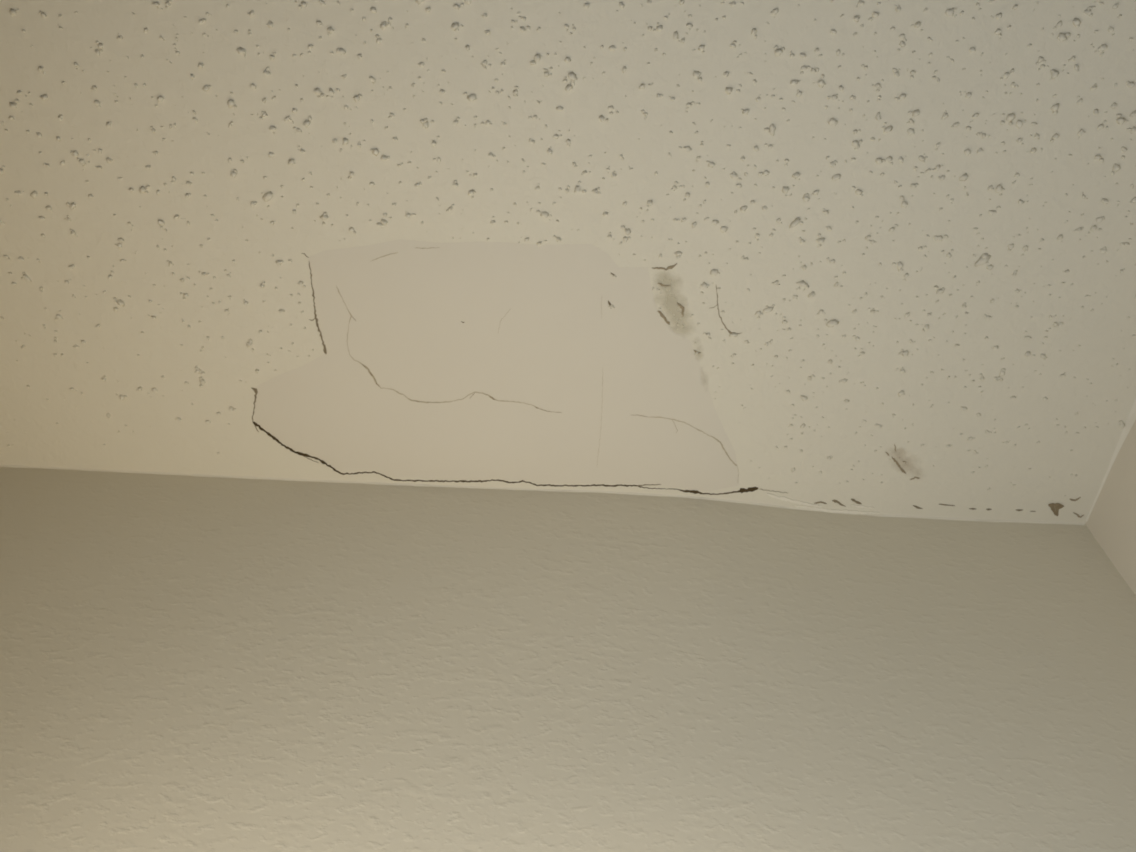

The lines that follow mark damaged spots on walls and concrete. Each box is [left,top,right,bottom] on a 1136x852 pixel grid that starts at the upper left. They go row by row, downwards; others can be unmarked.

crack [301,253,561,413]
crack [711,286,741,334]
crack [251,387,787,495]